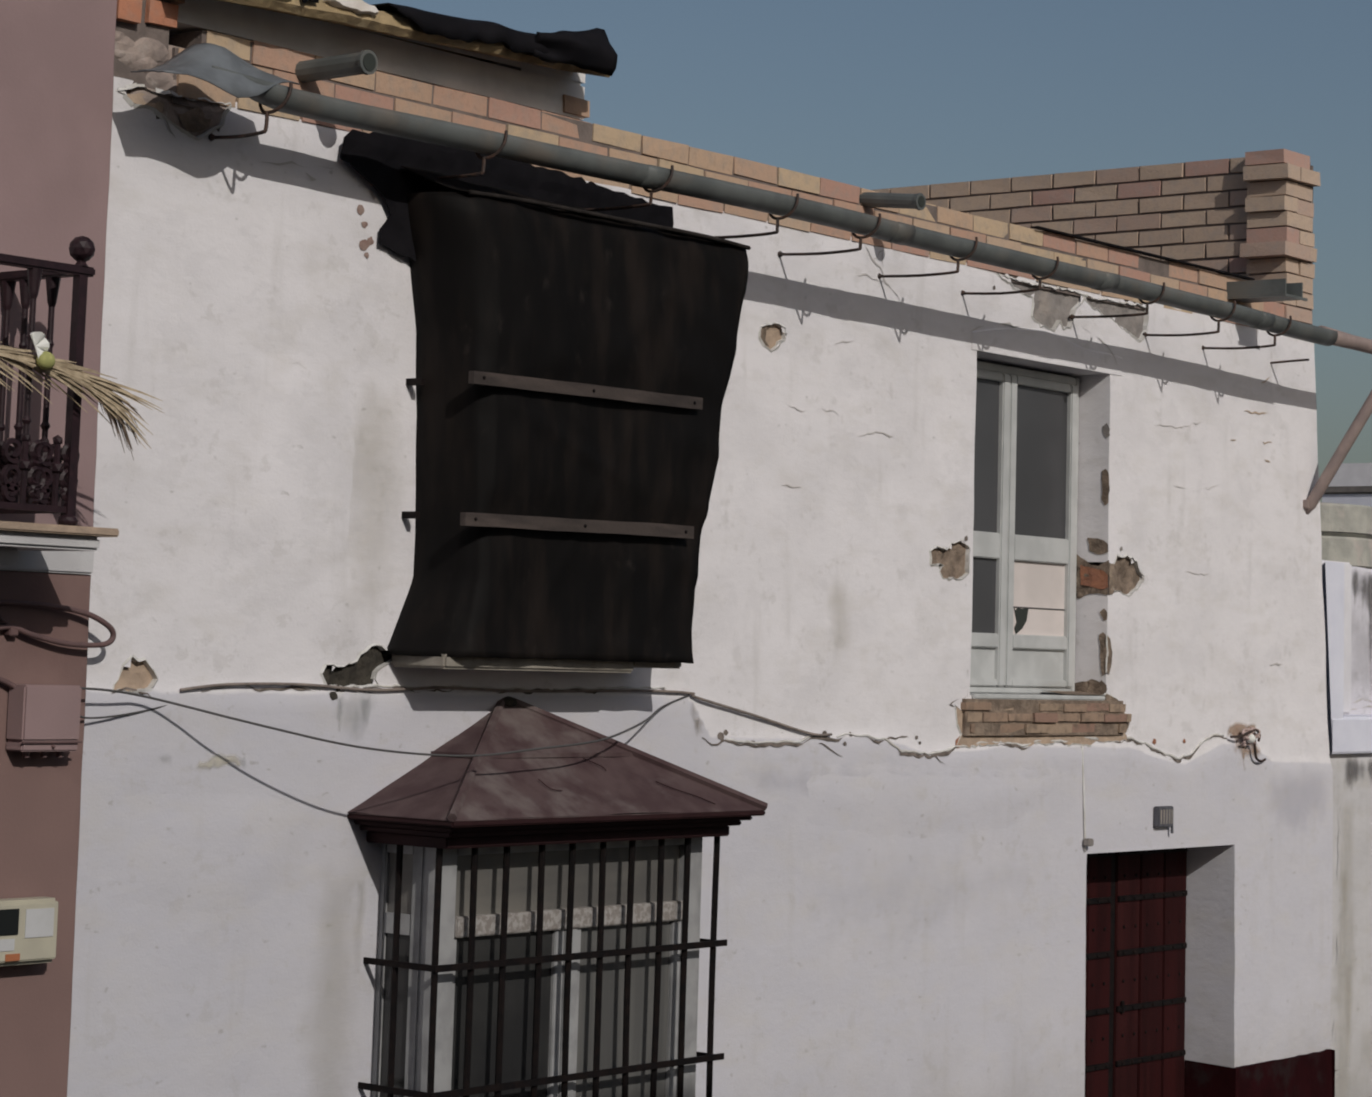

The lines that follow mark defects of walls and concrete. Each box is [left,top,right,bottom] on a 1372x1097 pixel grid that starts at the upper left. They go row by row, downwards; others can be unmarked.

spalling [115,83,232,141]
spalling [993,273,1149,343]
spalling [758,322,786,353]
spalling [929,536,970,581]
leakage [1354,575,1372,646]
spalling [954,538,1144,749]
spalling [112,654,158,697]
spalling [319,643,394,700]
crack [702,730,1227,764]
spalling [1229,724,1255,736]
leakage [1347,763,1372,779]